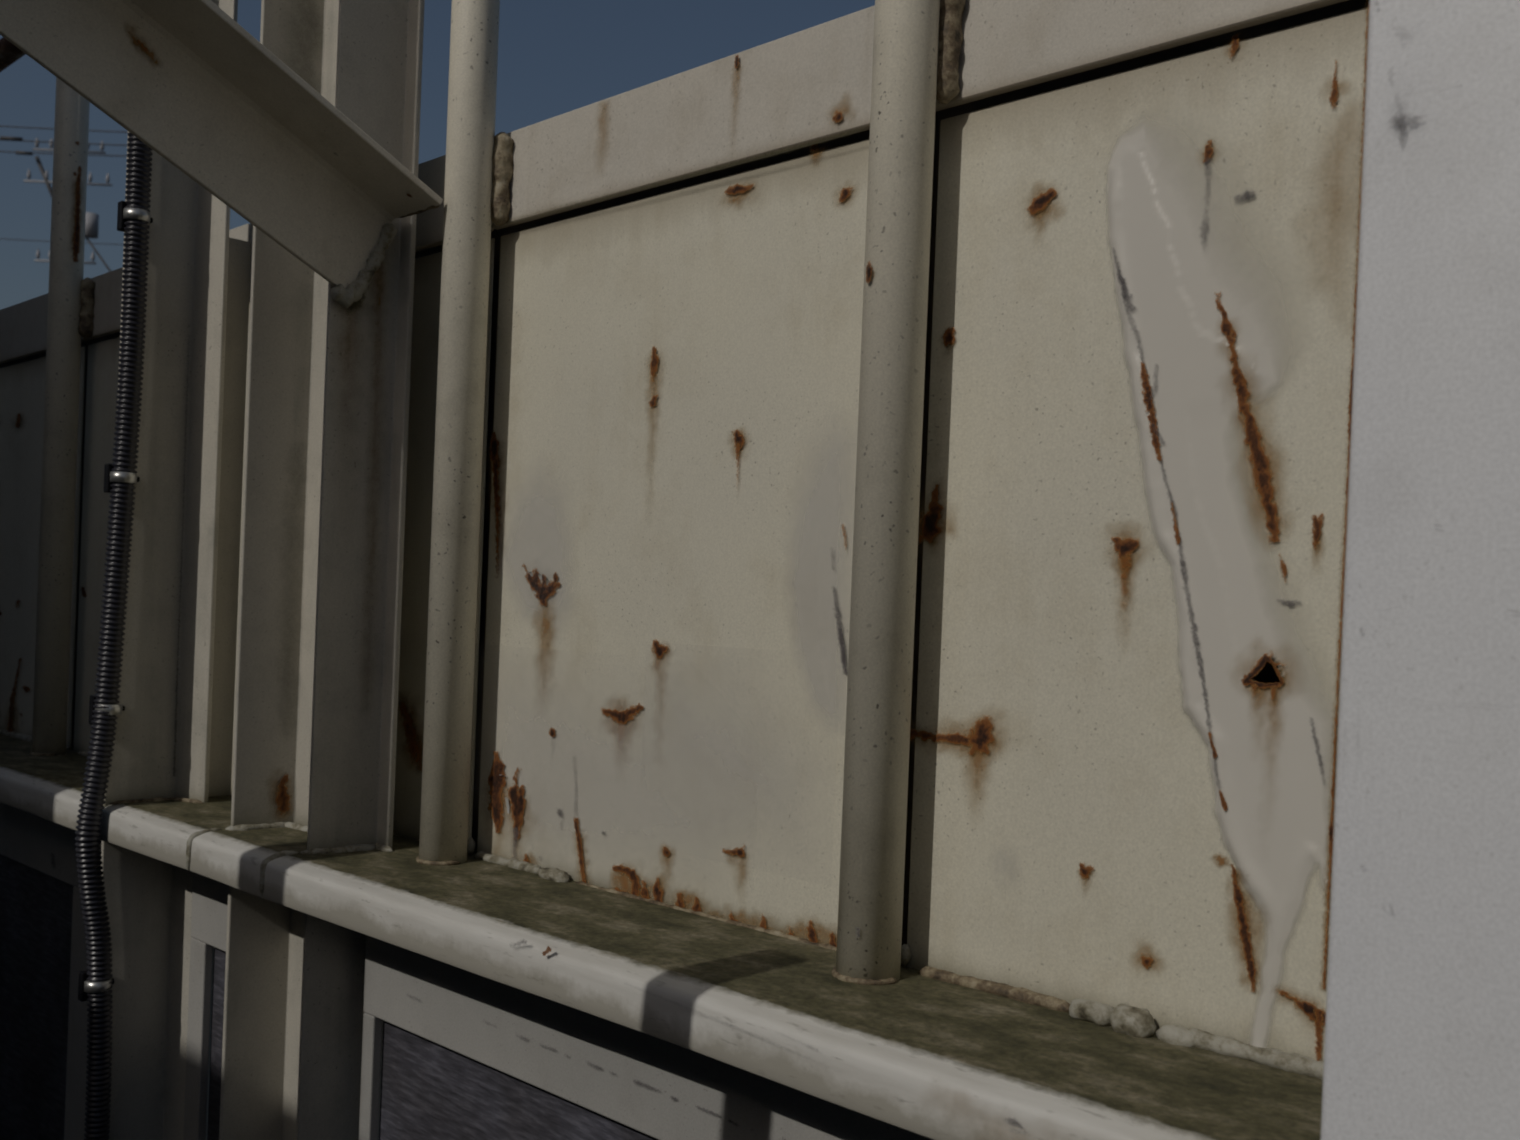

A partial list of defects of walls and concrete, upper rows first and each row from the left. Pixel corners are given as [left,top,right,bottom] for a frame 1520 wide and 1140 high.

rust [72,166,82,262]
rust [725,183,753,202]
rust [1027,188,1057,218]
crack [1116,263,1133,310]
rust [649,346,659,407]
rust [732,430,745,474]
rust [1215,292,1287,578]
rust [918,485,945,544]
crack [1140,362,1228,811]
rust [602,703,643,749]
rust [612,845,770,929]
rust [1214,855,1257,992]